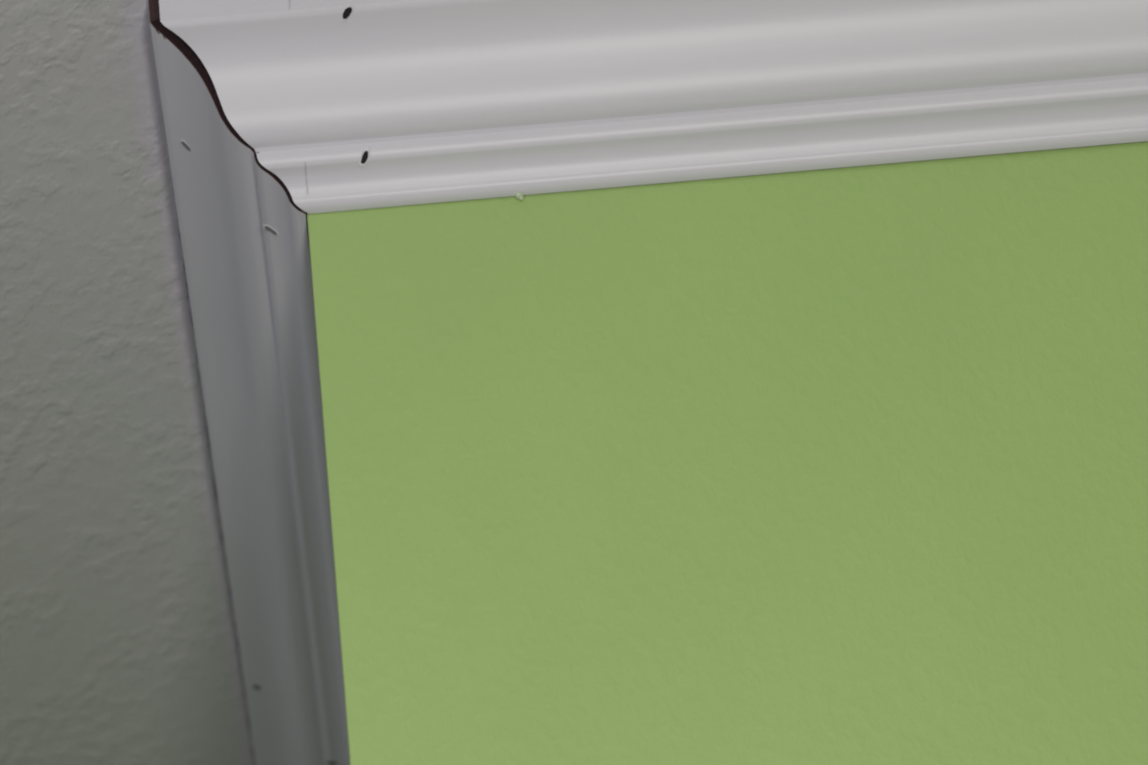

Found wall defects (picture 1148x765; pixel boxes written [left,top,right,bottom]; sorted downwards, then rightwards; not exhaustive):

crack [149,0,310,248]